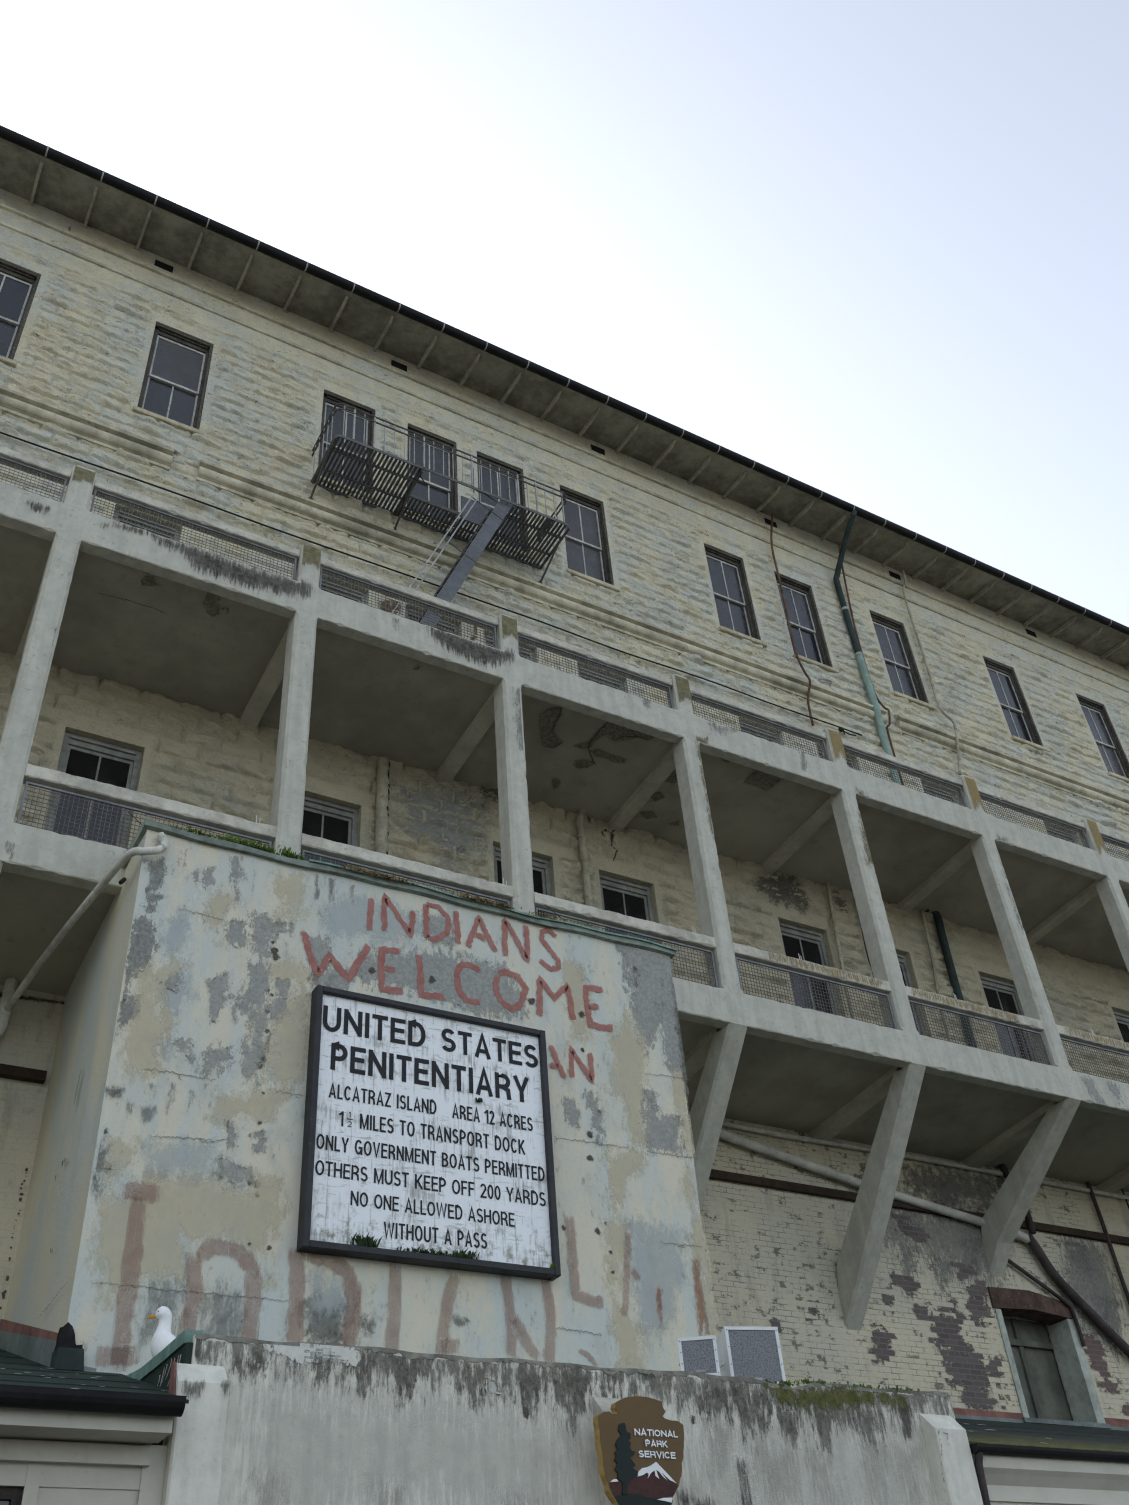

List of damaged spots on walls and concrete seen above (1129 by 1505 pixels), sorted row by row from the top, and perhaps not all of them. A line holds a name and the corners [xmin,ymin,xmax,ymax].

damp [100,522,311,597]
spalling [539,707,654,769]
peeling [117,857,182,1028]
peeling [173,909,530,1087]
peeling [212,1119,267,1186]
flaking render [890,1208,930,1248]
damp [460,1363,486,1410]
damp [518,1370,591,1436]
flaking render [769,1317,784,1333]
flaking render [805,1300,820,1323]
flaking render [868,1258,1008,1411]
flaking render [1080,1314,1129,1418]